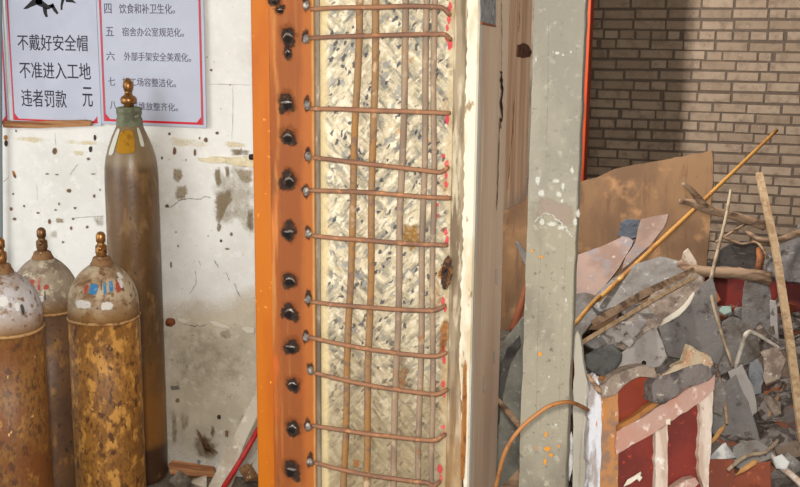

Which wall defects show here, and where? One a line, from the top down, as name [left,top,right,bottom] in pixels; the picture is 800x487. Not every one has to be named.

crack [497,42,514,200]
corrosion [437,255,453,290]